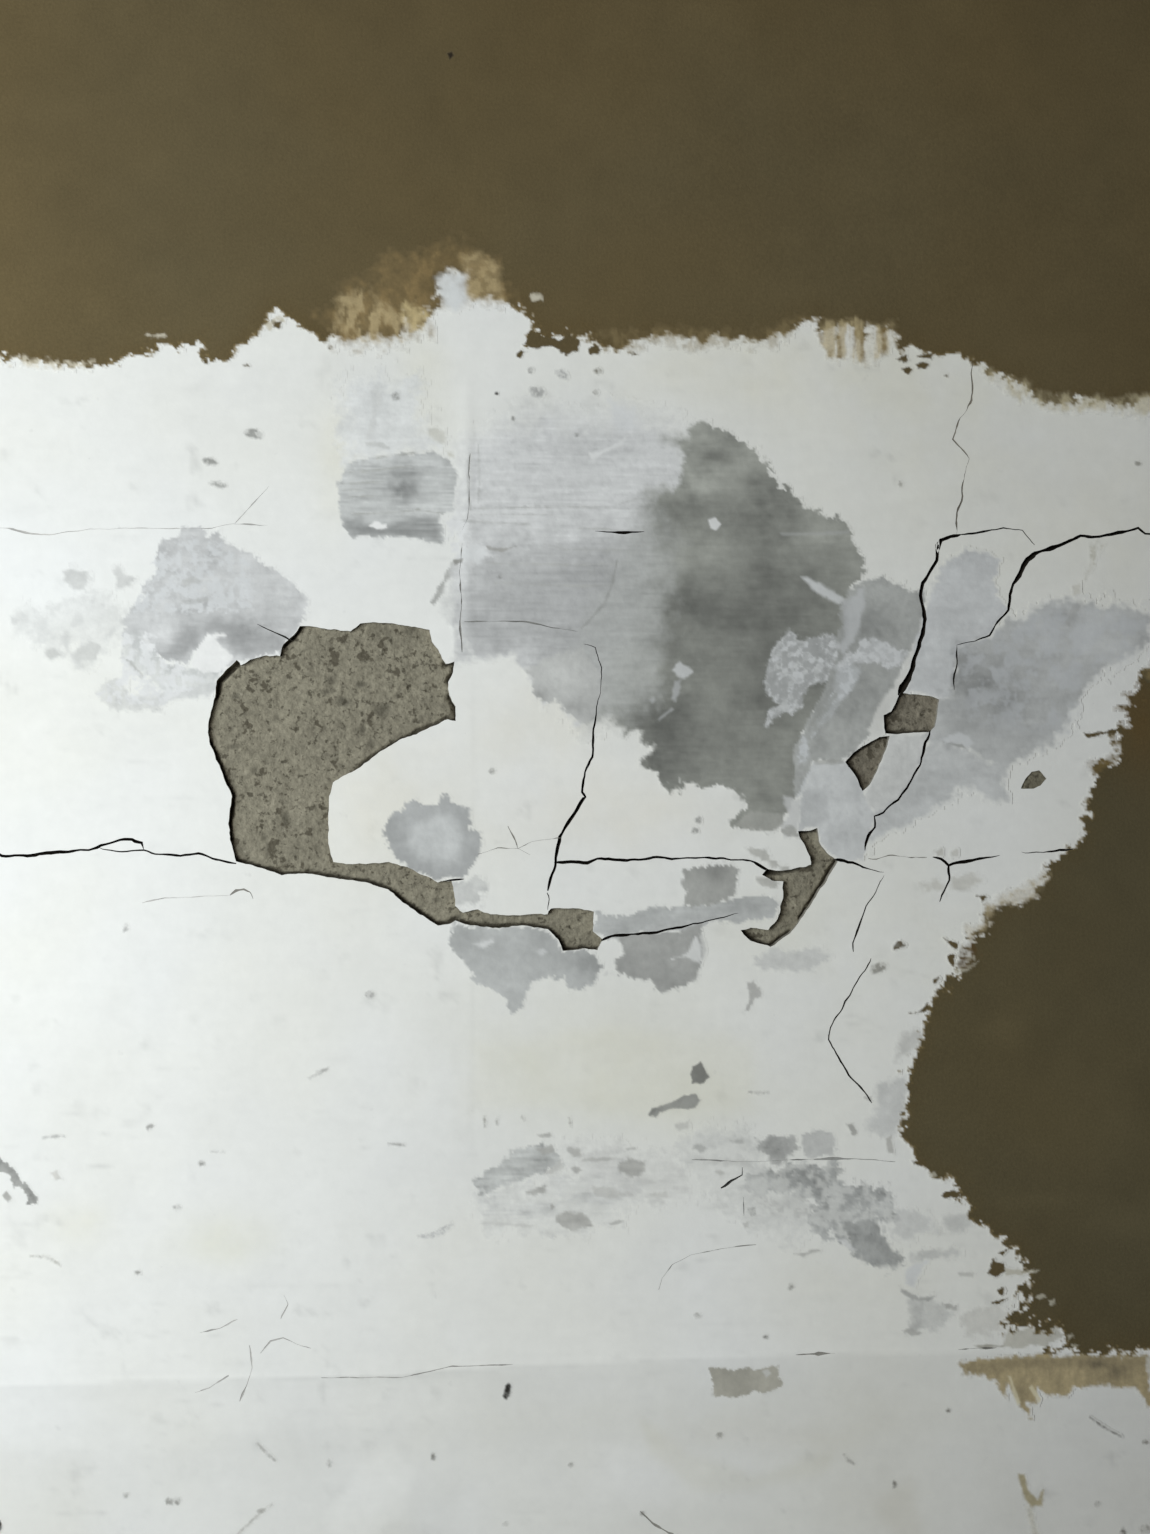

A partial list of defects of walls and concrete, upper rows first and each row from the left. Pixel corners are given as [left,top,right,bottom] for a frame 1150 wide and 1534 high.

leakage [325,247,544,351]
crack [898,363,1150,696]
peeling [8,359,1150,1016]
crack [445,453,769,905]
leakage [1084,751,1120,779]
crack [0,838,253,903]
crack [601,913,737,941]
crack [828,730,1073,1103]
peeling [0,1156,39,1207]